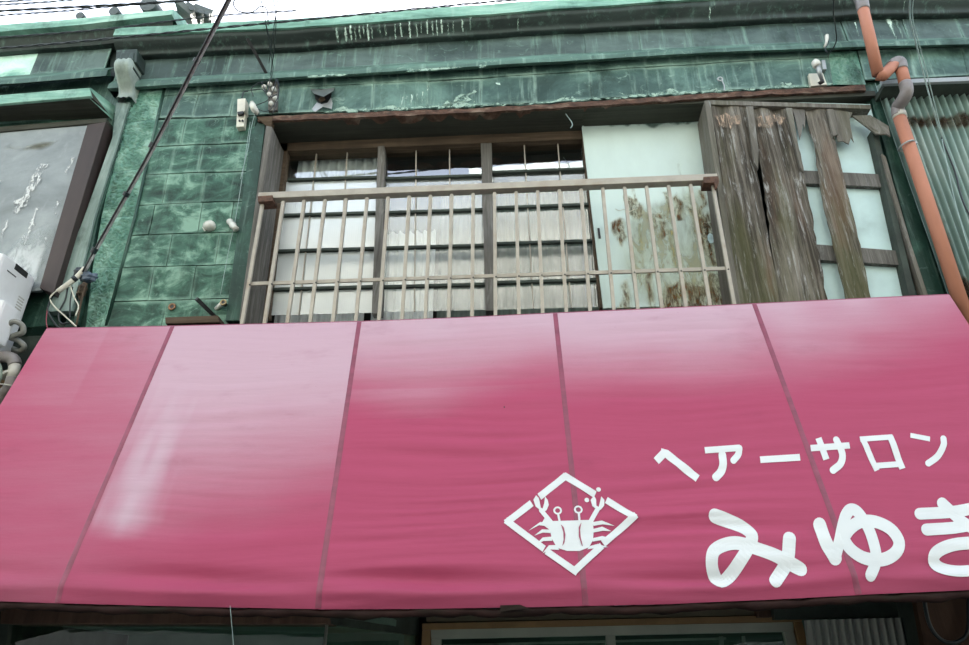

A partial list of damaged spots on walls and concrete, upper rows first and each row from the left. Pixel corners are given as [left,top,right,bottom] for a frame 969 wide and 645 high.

corrosion [907,112,969,128]
peeling [7,164,48,280]
corrosion [612,193,722,308]